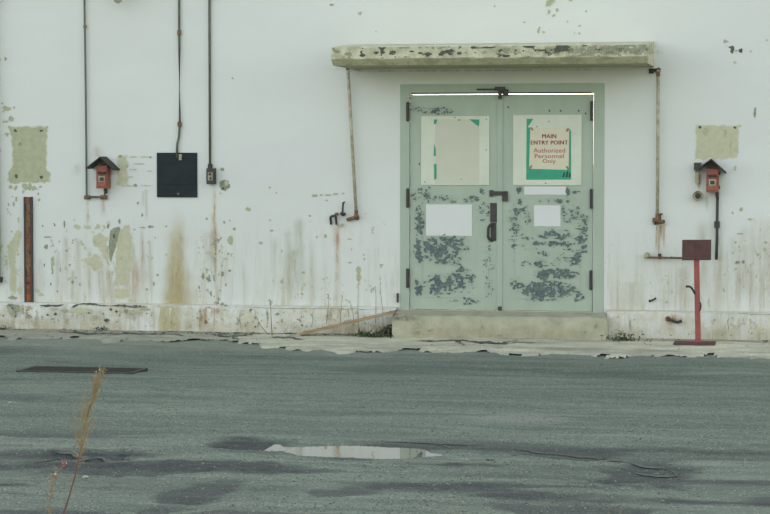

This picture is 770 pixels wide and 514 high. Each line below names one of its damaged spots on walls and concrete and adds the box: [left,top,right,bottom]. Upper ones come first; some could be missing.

spalling [332,45,646,58]
peeling [694,125,742,171]
peeling [1,102,156,328]
spalling [198,220,370,330]
peeling [411,187,493,305]
peeling [509,187,588,302]